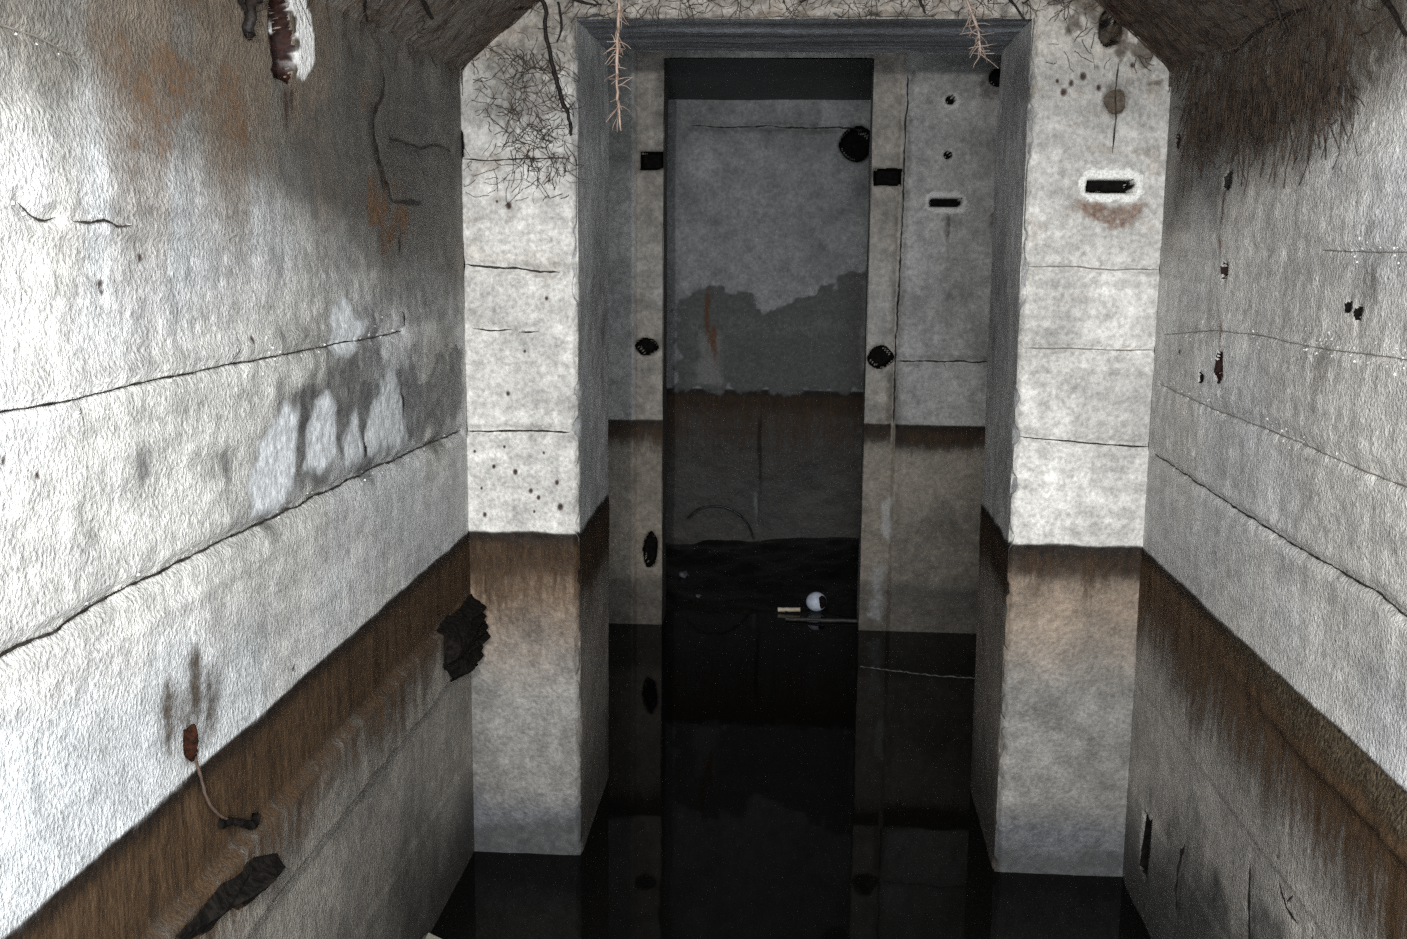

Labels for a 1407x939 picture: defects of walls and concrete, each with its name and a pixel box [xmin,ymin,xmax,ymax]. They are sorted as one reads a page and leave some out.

crack [11,201,132,233]
corrosion [1084,203,1136,227]
crack [0,312,406,433]
leakage [248,296,462,528]
crack [0,426,568,658]
crack [1019,431,1407,617]
leakage [979,504,1407,939]